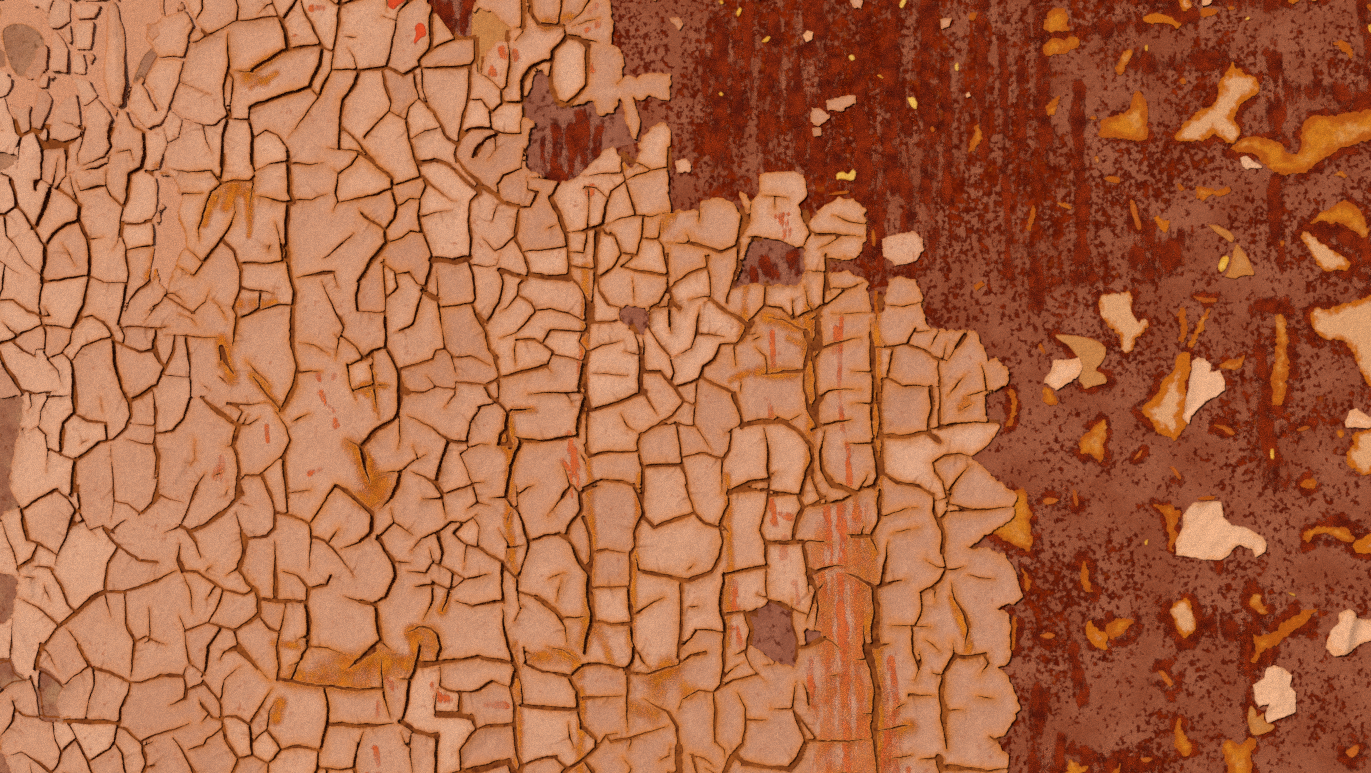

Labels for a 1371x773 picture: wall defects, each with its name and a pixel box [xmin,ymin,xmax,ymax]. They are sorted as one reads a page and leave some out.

rust [699,0,955,280]
peeling [810,95,856,137]
peeling [871,230,924,266]
rust [973,0,1290,395]
peeling [1090,58,1371,479]
rust [1262,0,1371,136]
crack [0,0,1023,773]
rust [807,442,915,773]
peeling [1068,549,1208,654]
peeling [1149,496,1267,560]
rust [1191,577,1317,773]
peeling [1222,586,1371,773]